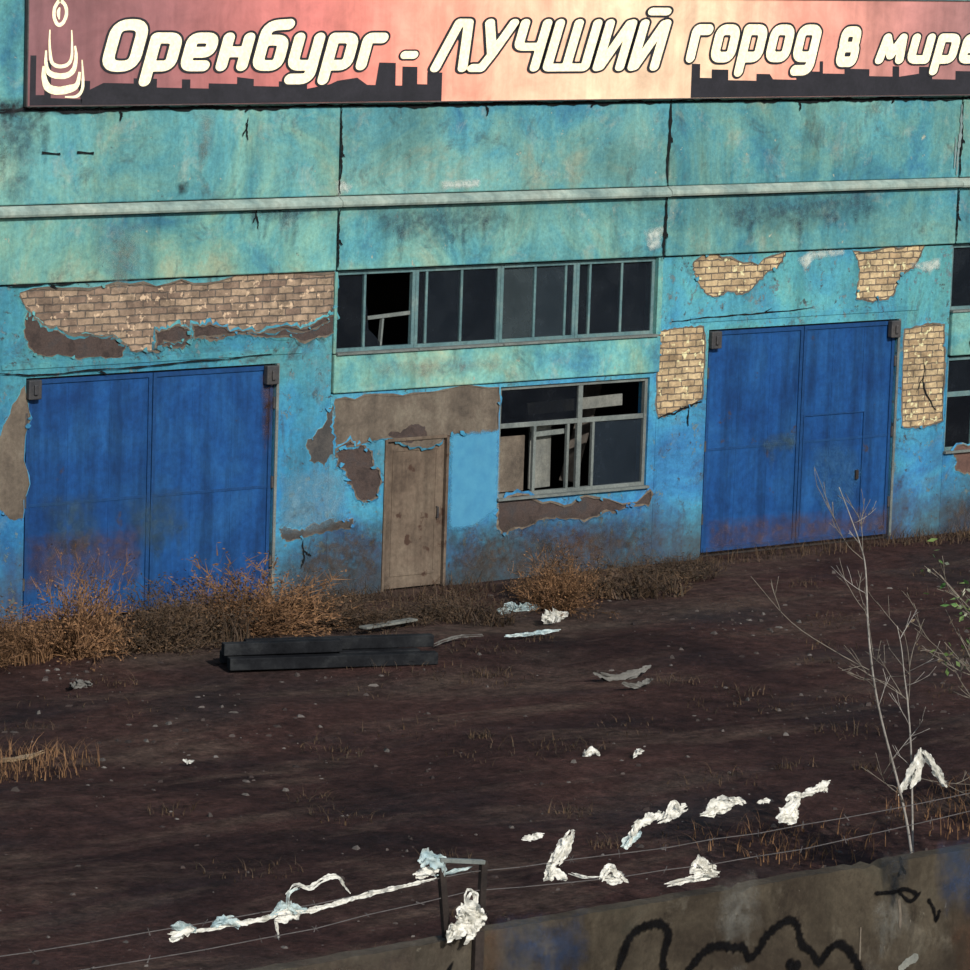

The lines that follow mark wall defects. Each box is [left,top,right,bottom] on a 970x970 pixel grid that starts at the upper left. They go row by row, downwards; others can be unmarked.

crack [0,96,970,267]
flaking render [17,271,340,360]
flaking render [690,251,786,299]
flaking render [851,245,925,305]
flaking render [652,323,708,420]
flaking render [898,320,948,431]
peeling [0,385,32,522]
peeling [305,384,502,506]
flaking render [951,442,970,478]
flaking render [493,486,655,537]